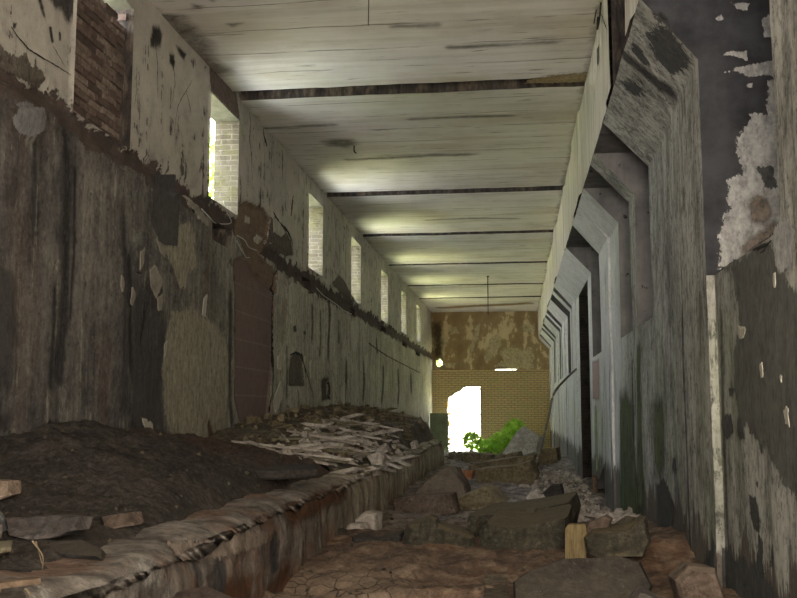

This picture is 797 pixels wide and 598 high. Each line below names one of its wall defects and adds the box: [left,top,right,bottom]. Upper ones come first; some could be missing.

spalling [0,44,46,89]
spalling [209,68,240,120]
leakage [0,267,17,387]
leakage [49,130,76,423]
peeling [120,275,136,305]
leakage [122,213,165,432]
peeling [139,195,312,438]
peeling [717,50,797,501]
leakage [632,345,643,509]
leakage [654,400,664,475]
leakage [720,310,728,540]
peeling [703,482,777,598]